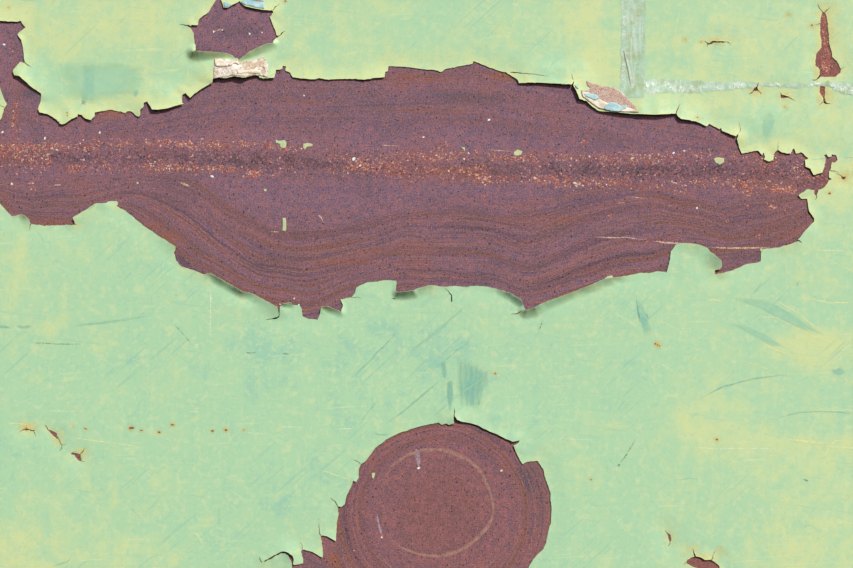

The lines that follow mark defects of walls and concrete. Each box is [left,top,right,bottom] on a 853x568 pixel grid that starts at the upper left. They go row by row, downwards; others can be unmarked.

peeling [0,0,852,336]
peeling [18,421,88,465]
peeling [245,398,569,568]
peeling [660,525,728,568]